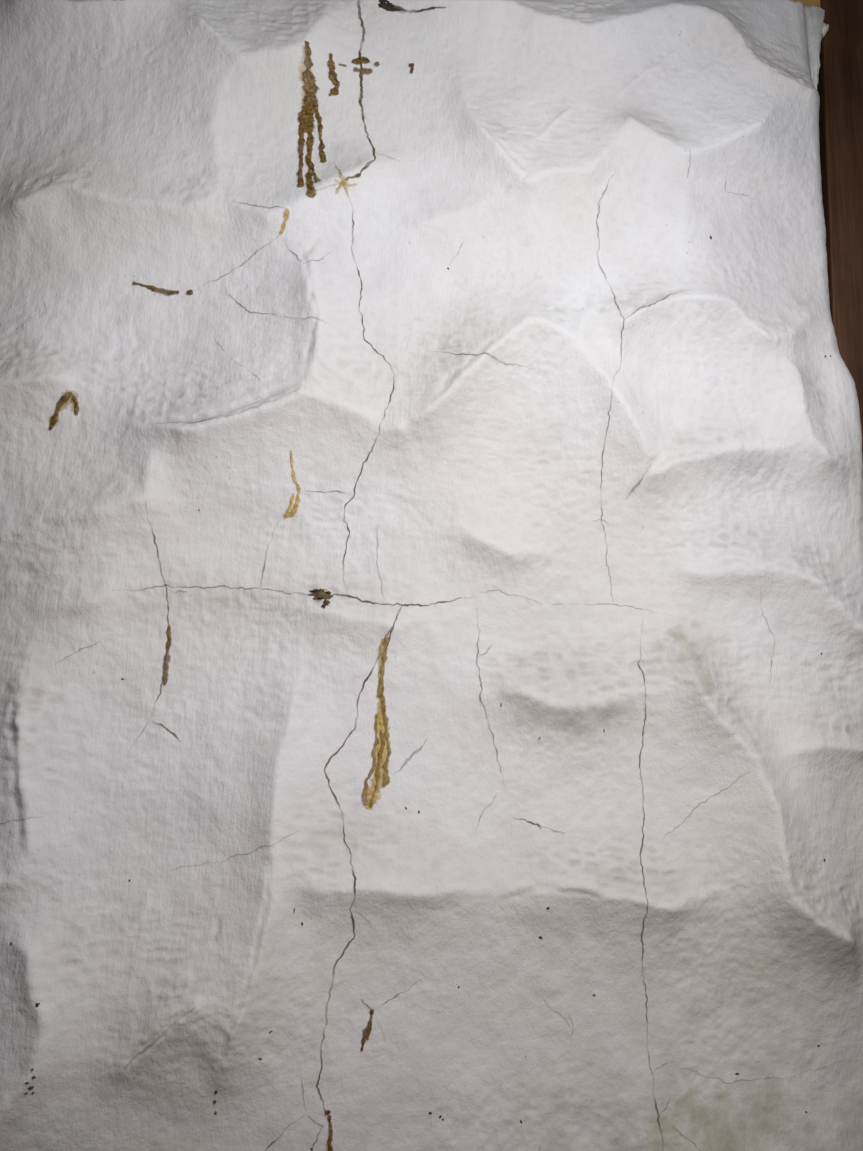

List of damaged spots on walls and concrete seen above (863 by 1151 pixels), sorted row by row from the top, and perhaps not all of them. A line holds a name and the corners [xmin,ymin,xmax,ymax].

corrosion [297,41,380,197]
crack [342,5,376,182]
corrosion [133,281,193,295]
crack [357,269,394,401]
corrosion [49,391,79,430]
crack [343,450,372,566]
corrosion [162,625,172,685]
corrosion [362,637,391,809]
crack [324,594,451,966]
crack [638,666,646,780]
crack [640,816,648,953]
corrosion [361,1009,374,1051]